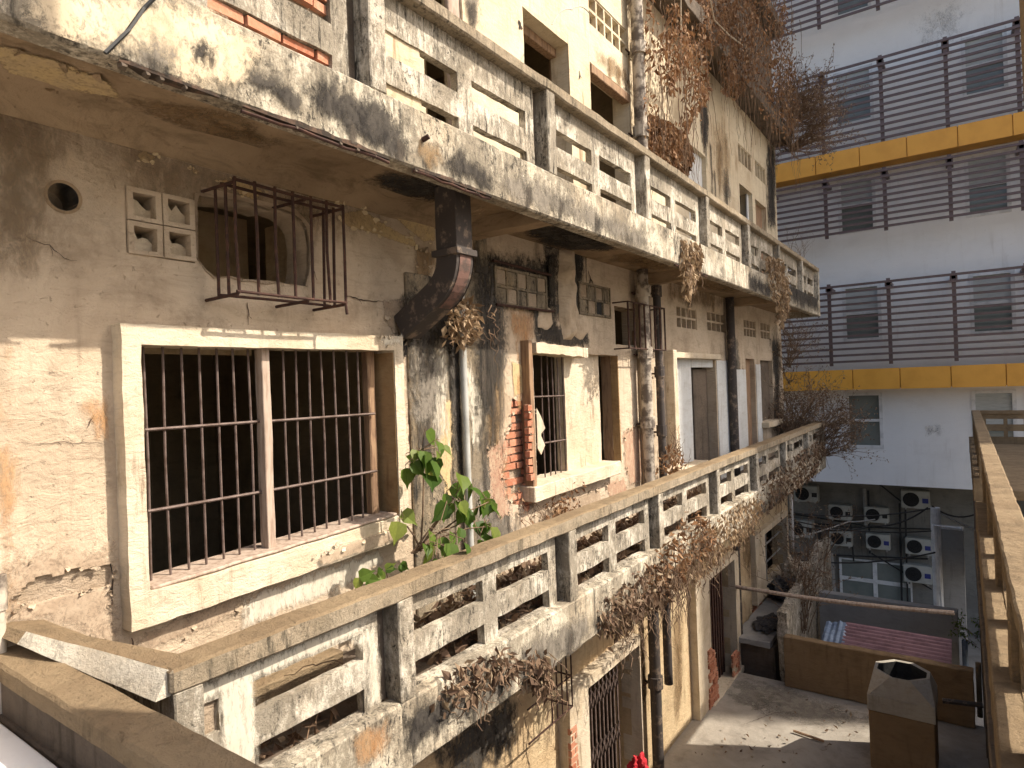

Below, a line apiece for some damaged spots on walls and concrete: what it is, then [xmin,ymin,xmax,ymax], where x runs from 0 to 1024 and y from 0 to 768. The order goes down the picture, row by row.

peeling [0,47,120,102]
damp [700,101,731,205]
damp [766,139,777,228]
damp [29,0,668,541]
rust [439,254,471,309]
flaking render [487,400,642,520]
peeling [4,542,120,640]
mould [405,617,592,768]
flaking render [707,648,720,710]
flaking render [731,650,741,678]